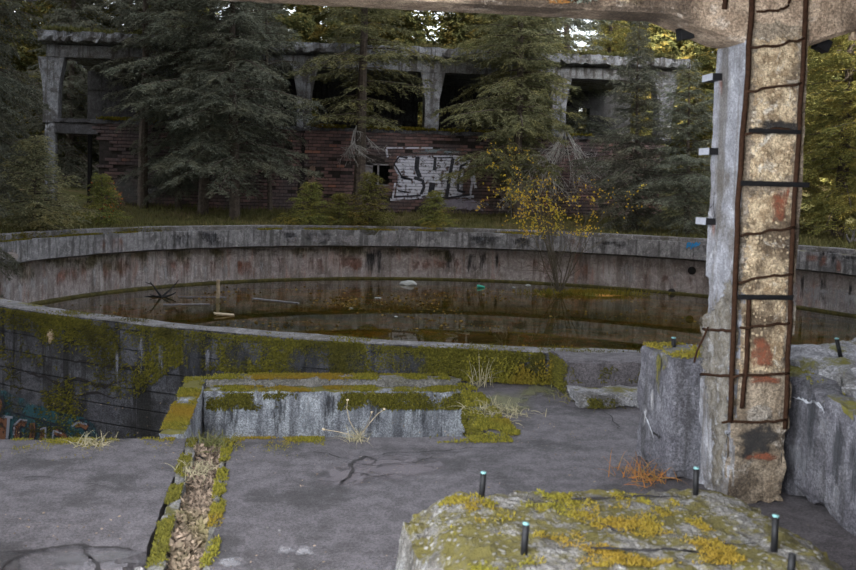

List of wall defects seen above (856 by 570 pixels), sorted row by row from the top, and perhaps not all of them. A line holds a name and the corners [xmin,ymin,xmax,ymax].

corrosion [772,187,789,221]
leakage [168,232,230,278]
leakage [284,232,413,273]
leakage [467,236,500,272]
corrosion [751,337,780,384]
crack [307,447,495,488]